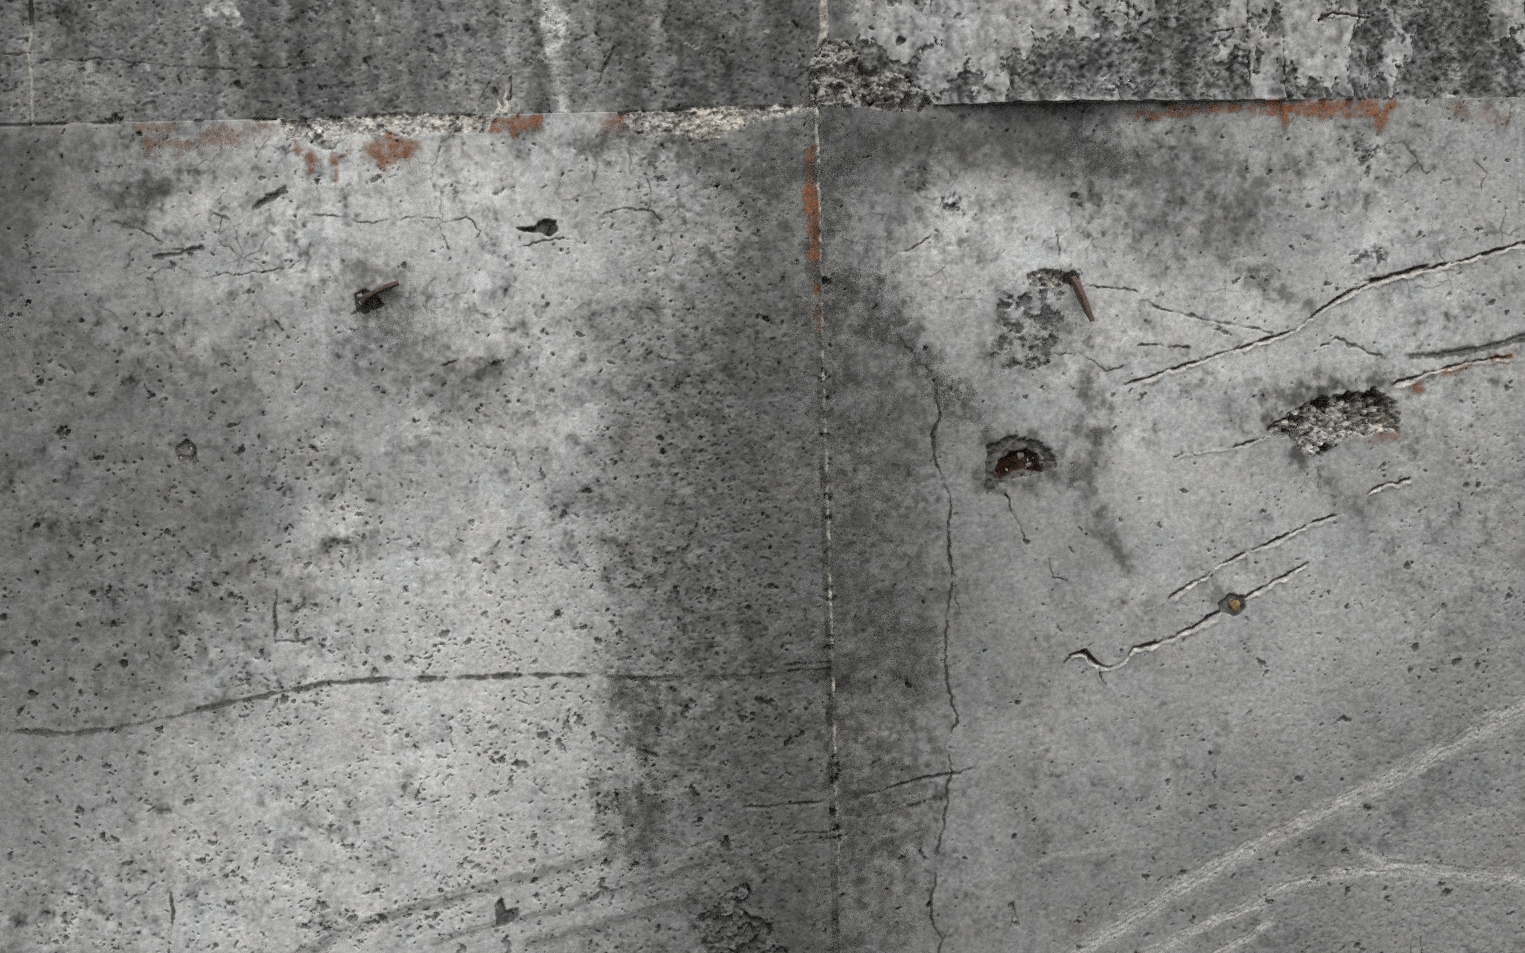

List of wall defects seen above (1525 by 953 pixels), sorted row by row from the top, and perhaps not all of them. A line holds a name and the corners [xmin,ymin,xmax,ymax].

corrosion [368,135,417,167]
corrosion [489,115,543,137]
corrosion [1136,99,1397,131]
corrosion [802,146,819,261]
crack [1056,234,1525,388]
spalling [1273,389,1398,455]
crack [1370,477,1411,495]
crack [1064,514,1336,684]
crack [900,338,960,953]